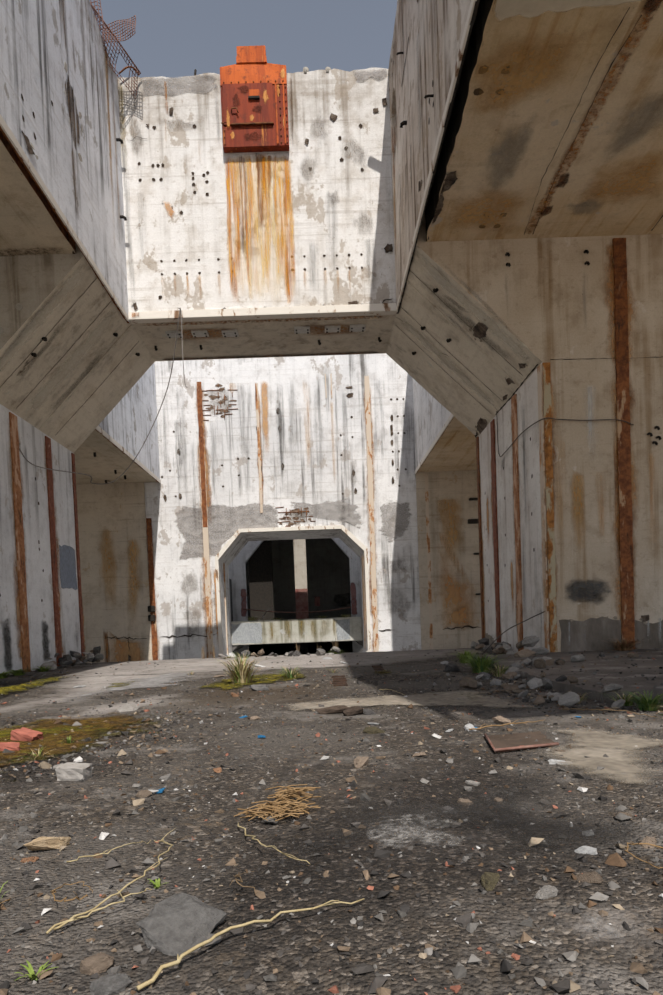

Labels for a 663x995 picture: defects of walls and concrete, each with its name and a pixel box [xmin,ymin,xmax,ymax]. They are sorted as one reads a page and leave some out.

rust [226,154,295,297]